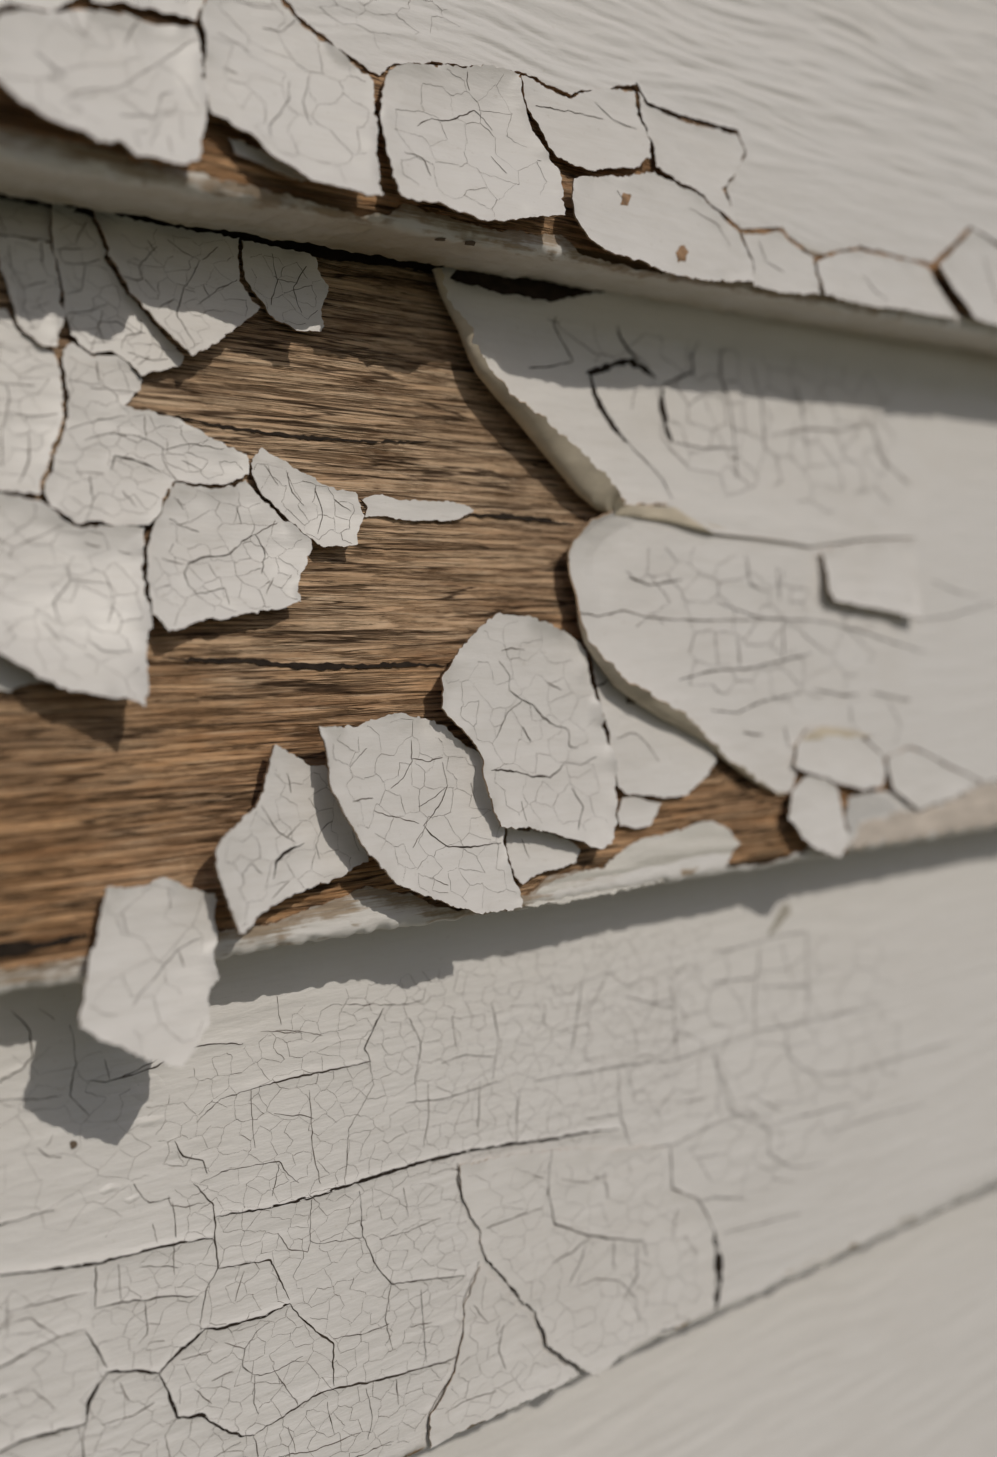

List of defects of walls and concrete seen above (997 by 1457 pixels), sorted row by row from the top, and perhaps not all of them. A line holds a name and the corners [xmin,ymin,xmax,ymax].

crack [2,0,738,214]
peeling [0,0,997,326]
crack [225,624,659,927]
peeling [0,204,982,1067]
crack [0,884,899,1457]